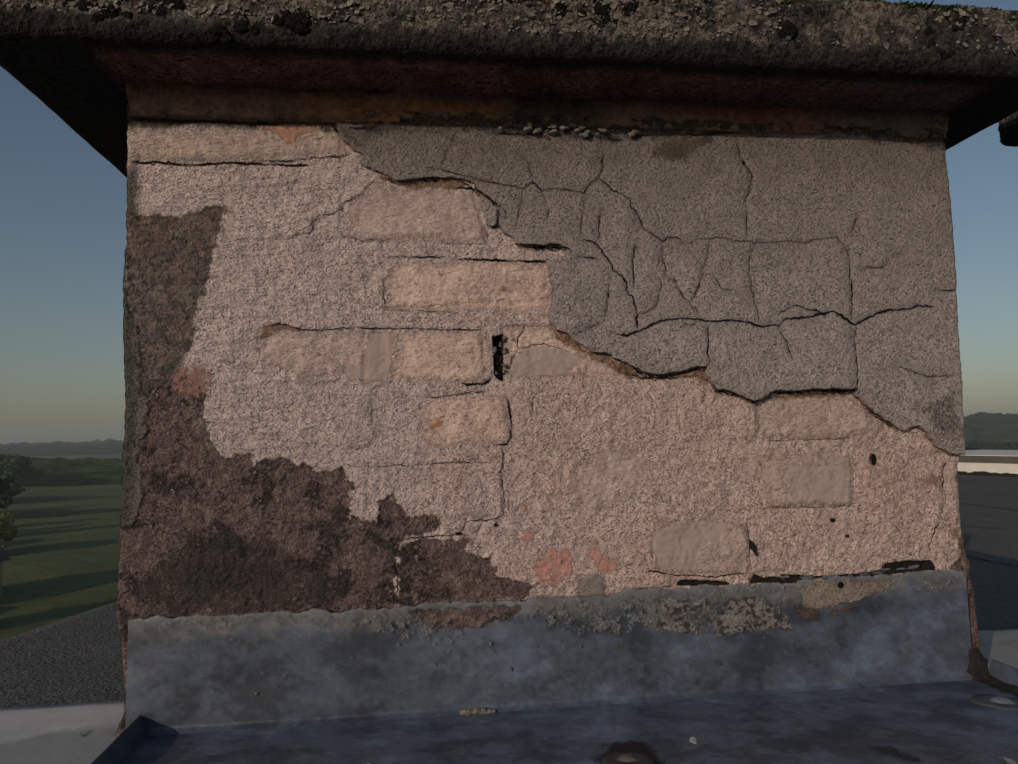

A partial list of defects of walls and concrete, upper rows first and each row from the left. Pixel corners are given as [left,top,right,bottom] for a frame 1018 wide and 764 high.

peeling [116,205,550,737]
spalling [347,185,486,243]
crack [129,120,955,612]